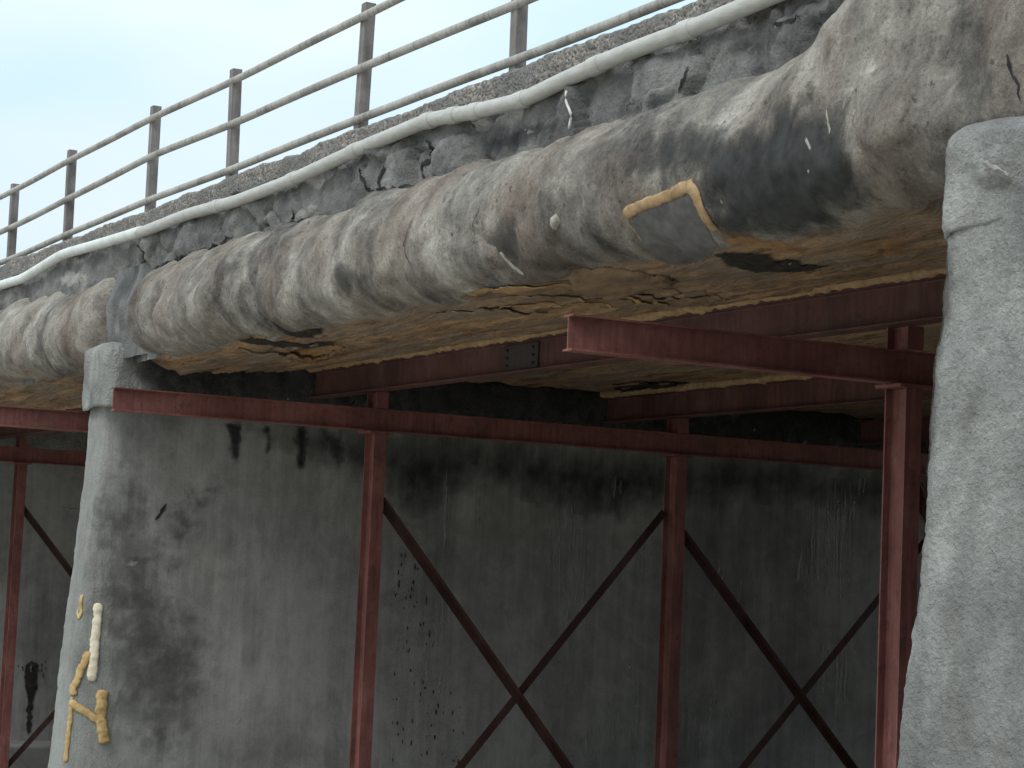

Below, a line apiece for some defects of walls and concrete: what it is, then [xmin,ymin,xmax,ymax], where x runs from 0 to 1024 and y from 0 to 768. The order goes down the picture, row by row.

crack [358,140,434,193]
damp [651,102,857,234]
spalling [714,234,827,273]
peeling [433,280,729,316]
spalling [238,321,348,363]
spalling [611,381,688,393]
damp [226,424,241,459]
damp [18,661,46,734]
crack [63,594,110,762]